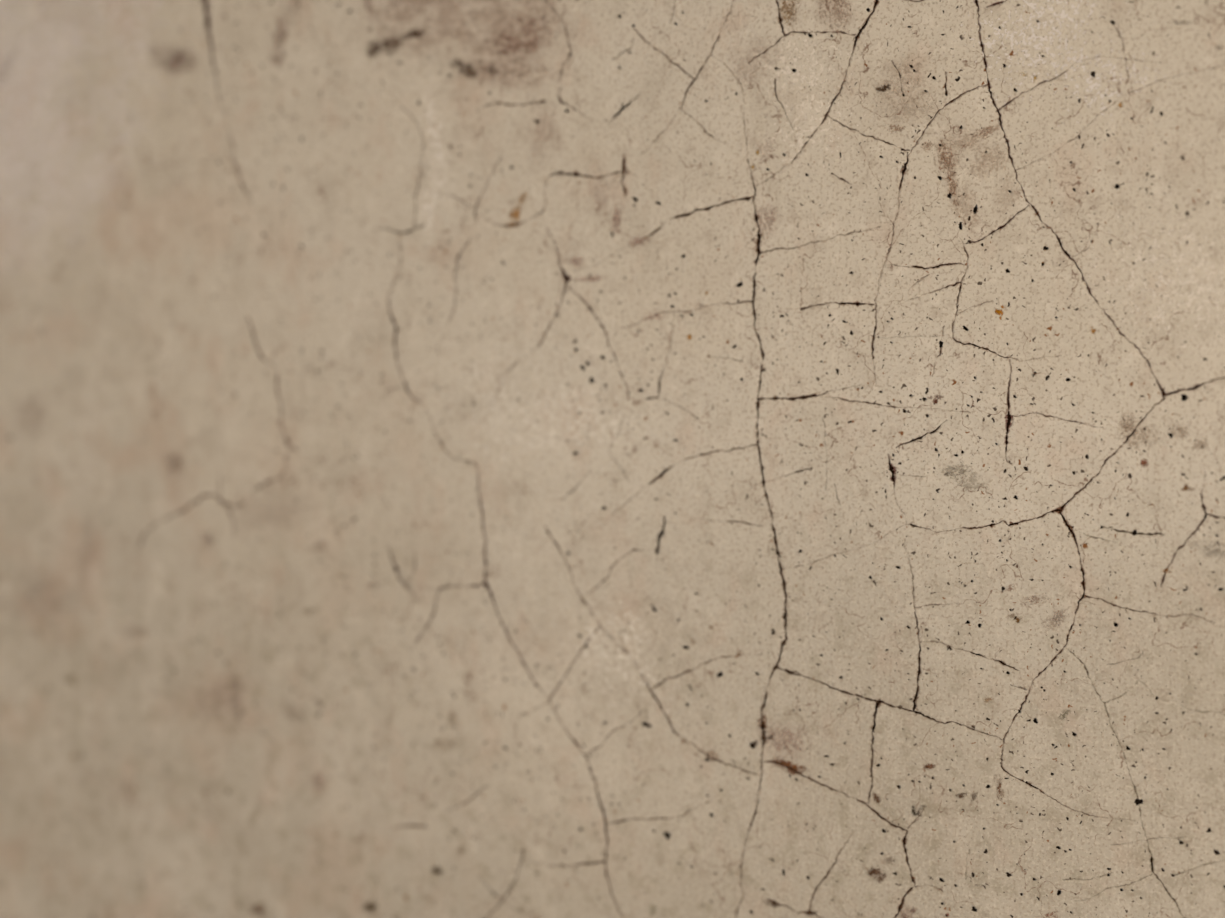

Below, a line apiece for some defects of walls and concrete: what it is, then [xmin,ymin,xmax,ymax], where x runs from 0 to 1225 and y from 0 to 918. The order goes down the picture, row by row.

crack [204,0,219,98]
crack [416,0,1225,918]